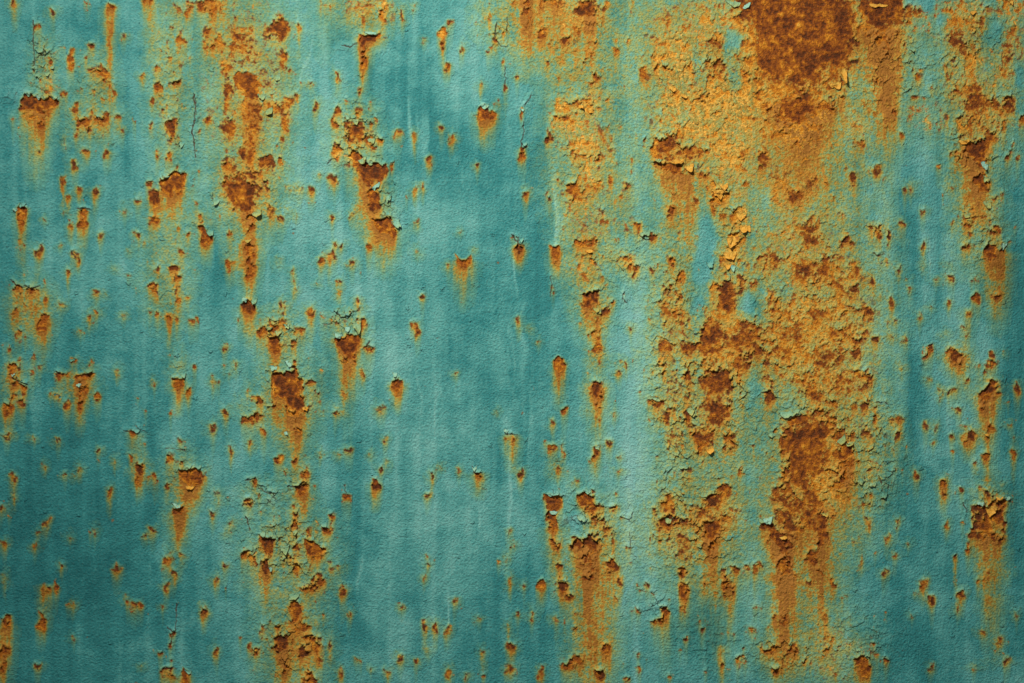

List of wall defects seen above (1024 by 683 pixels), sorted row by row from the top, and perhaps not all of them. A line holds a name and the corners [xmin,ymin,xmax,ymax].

crack [187,86,203,167]
rust [0,0,464,513]
peeling [315,140,411,281]
peeling [632,134,760,274]
rust [416,0,1024,683]
rust [196,482,488,683]